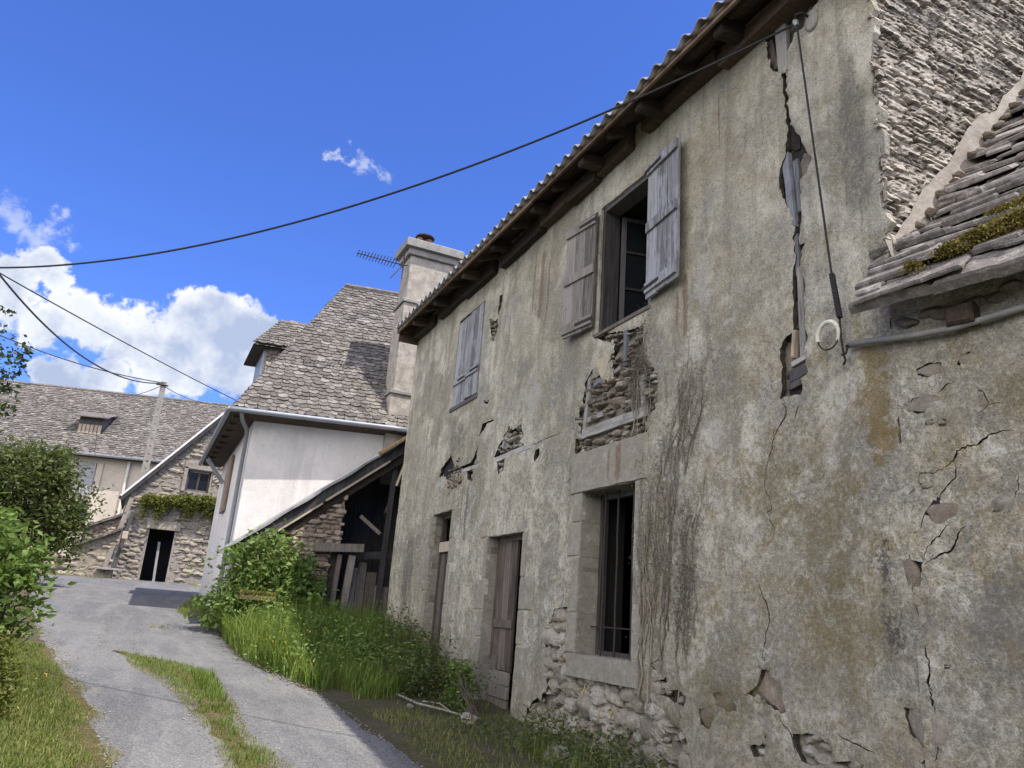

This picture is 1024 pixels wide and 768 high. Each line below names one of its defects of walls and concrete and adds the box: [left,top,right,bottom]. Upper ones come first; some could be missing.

flaking render [764,0,818,75]
flaking render [785,233,808,396]
flaking render [575,323,659,453]
flaking render [442,453,481,496]
flaking render [493,423,540,474]
flaking render [927,500,958,524]
crack [919,433,997,515]
flaking render [903,557,923,588]
flaking render [523,608,691,768]
flaking render [798,734,864,768]